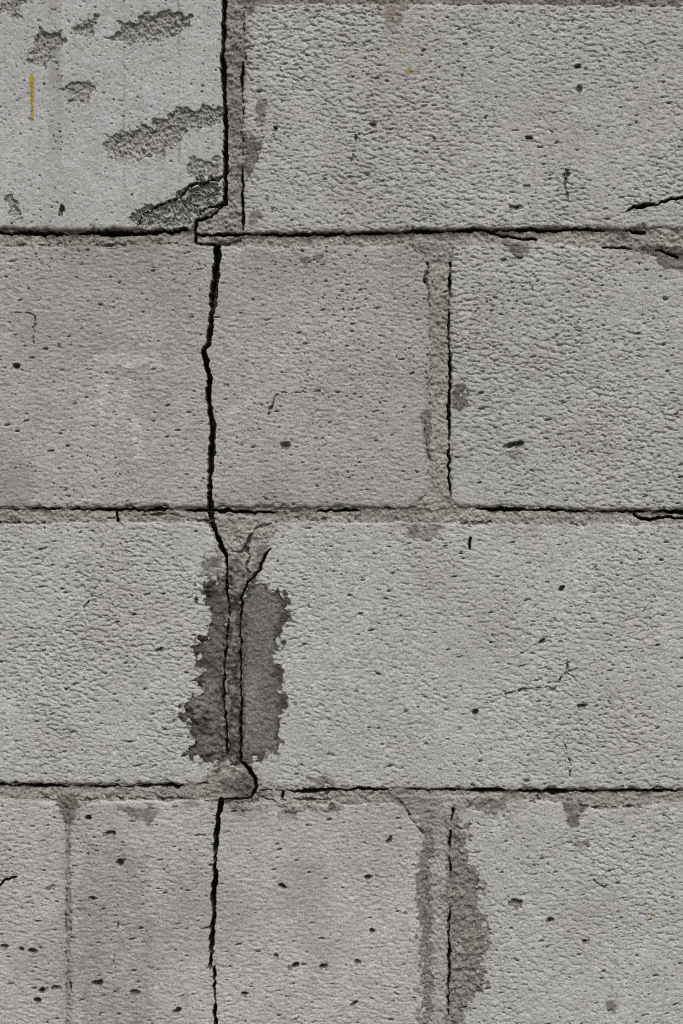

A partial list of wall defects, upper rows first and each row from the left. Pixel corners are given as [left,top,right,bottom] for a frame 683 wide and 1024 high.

spalling [110,9,193,48]
spalling [25,13,101,110]
spalling [103,101,229,234]
crack [626,196,683,212]
crack [0,230,67,246]
crack [601,229,646,250]
crack [655,250,679,259]
crack [0,506,175,525]
crack [78,0,604,1024]
damp [173,563,295,772]
crack [400,746,683,816]